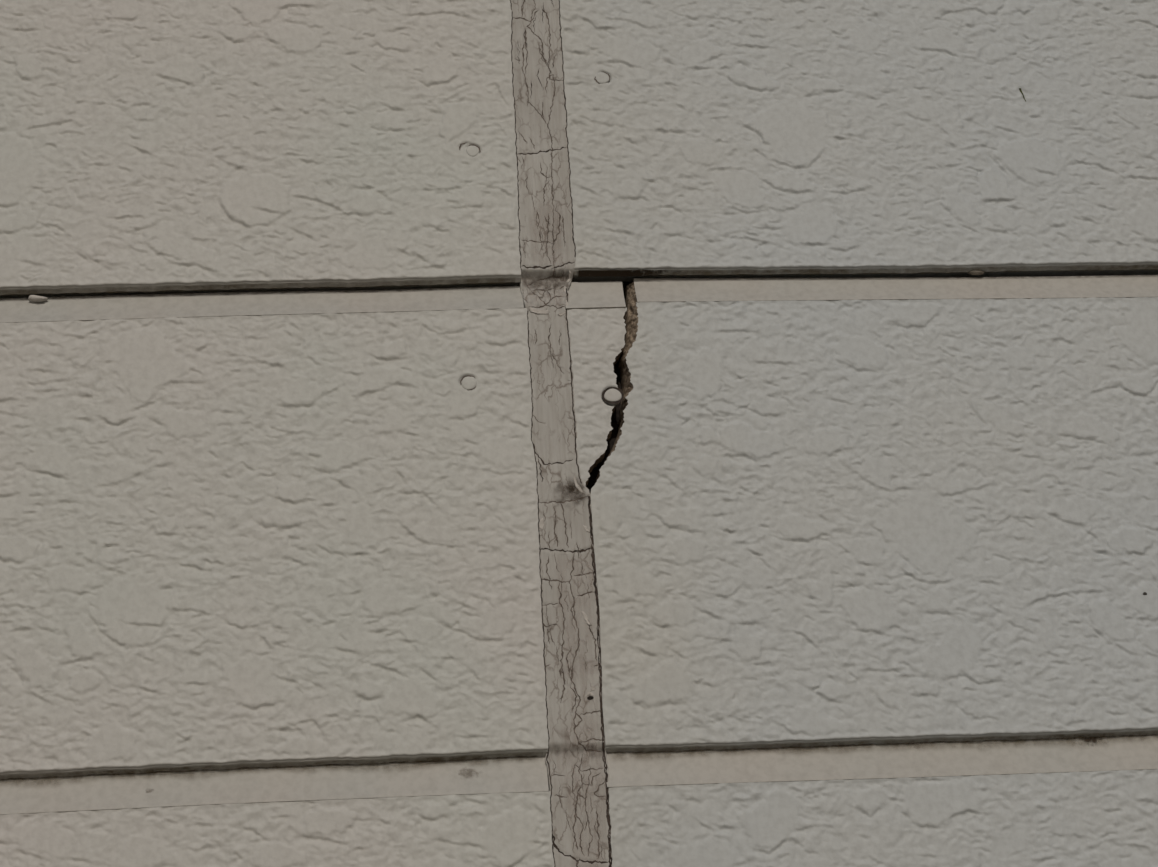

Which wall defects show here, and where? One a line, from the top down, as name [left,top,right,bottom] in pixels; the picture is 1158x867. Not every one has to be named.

crack [510,0,638,867]